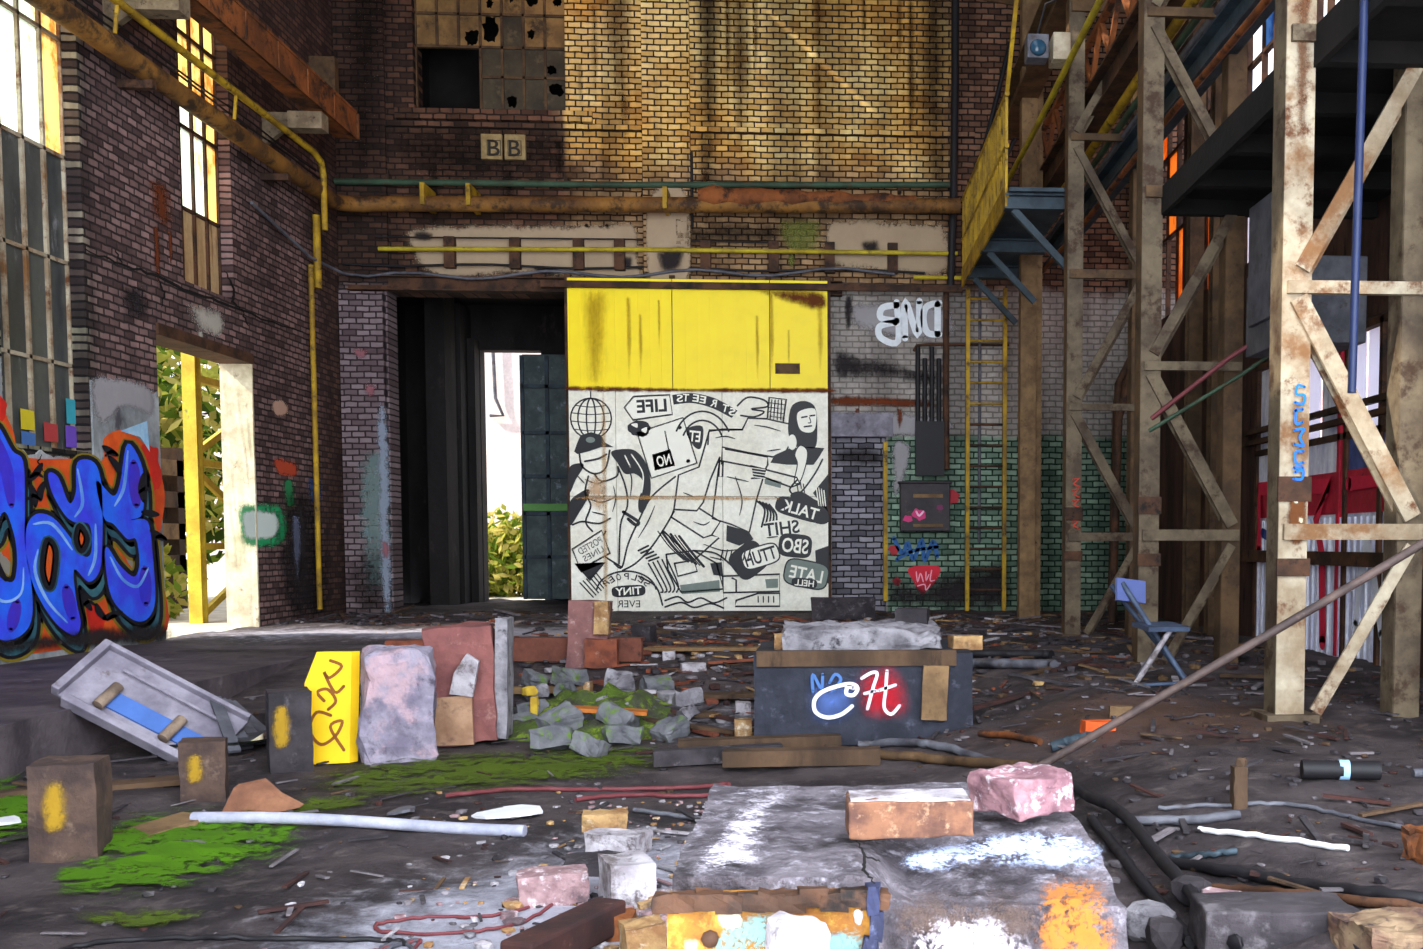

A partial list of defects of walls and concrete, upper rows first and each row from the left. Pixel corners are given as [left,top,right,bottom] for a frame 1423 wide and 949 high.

leakage [700,0,757,182]
leakage [899,0,944,124]
flaking render [409,188,690,279]
flaking render [826,220,948,275]